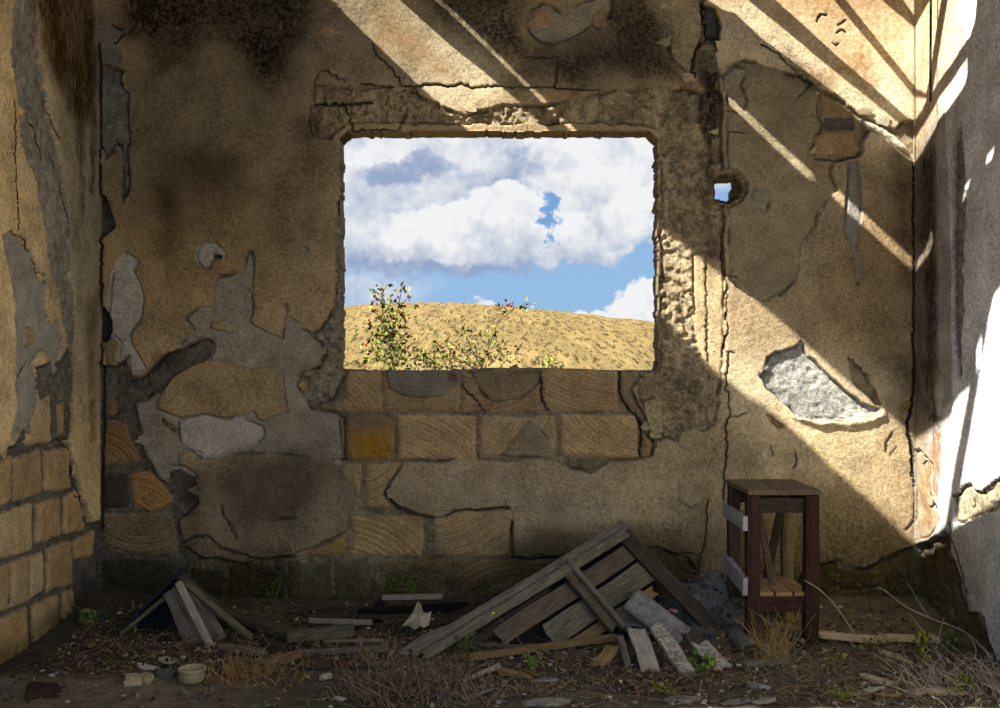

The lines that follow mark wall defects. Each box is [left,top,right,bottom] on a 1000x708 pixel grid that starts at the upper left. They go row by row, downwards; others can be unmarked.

leakage [130,0,312,74]
crack [308,44,600,138]
spalling [524,0,614,45]
spalling [0,0,347,667]
spalling [190,59,914,599]
crack [647,206,748,577]
spalling [820,449,1000,653]
crack [885,161,1000,612]